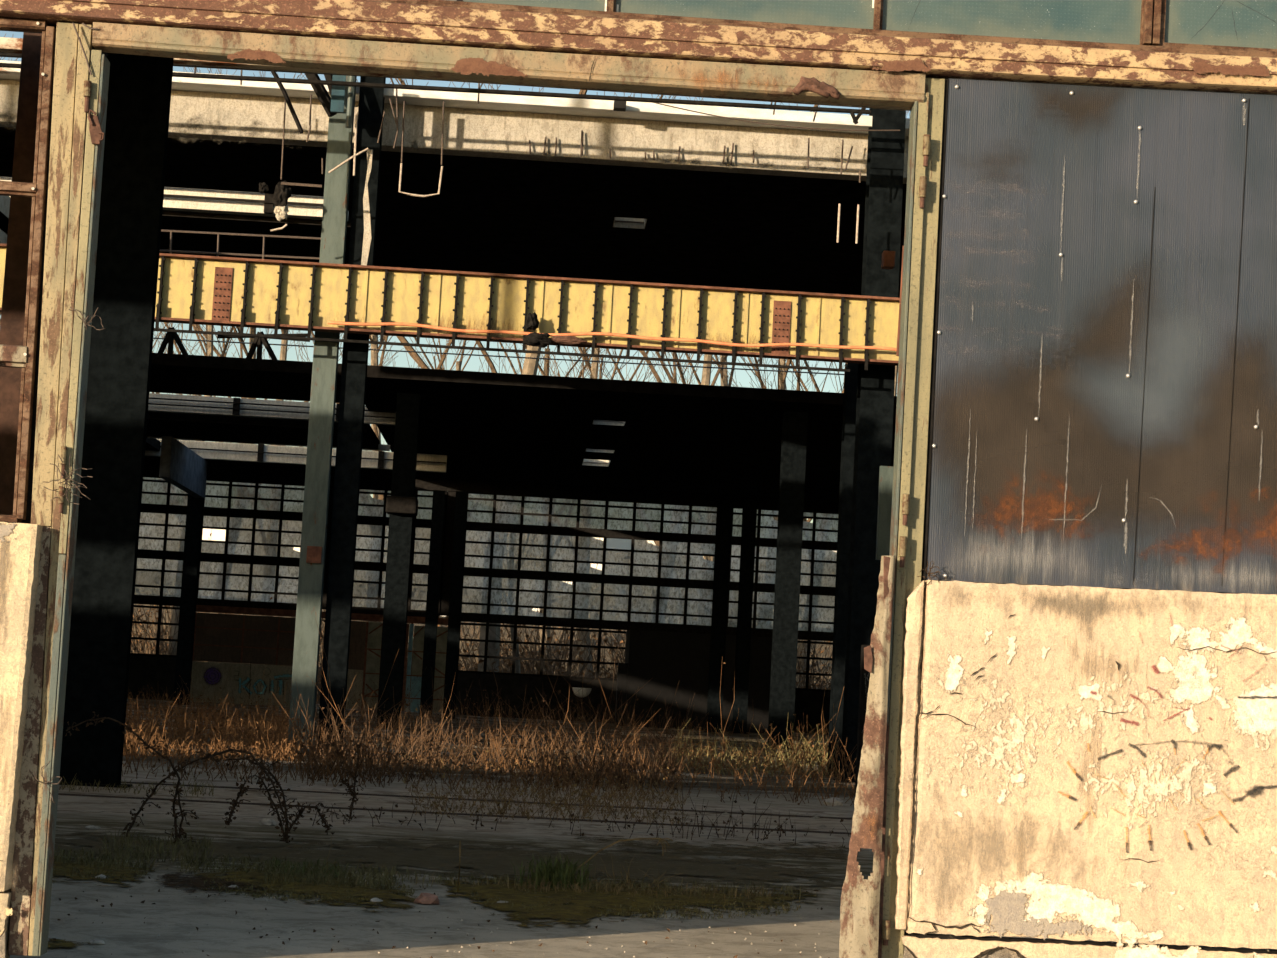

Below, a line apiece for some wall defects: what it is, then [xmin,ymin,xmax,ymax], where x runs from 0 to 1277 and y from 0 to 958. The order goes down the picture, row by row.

rust [1189,60,1269,77]
spalling [0,522,16,543]
peeling [925,615,1277,839]
peeling [967,871,1202,958]